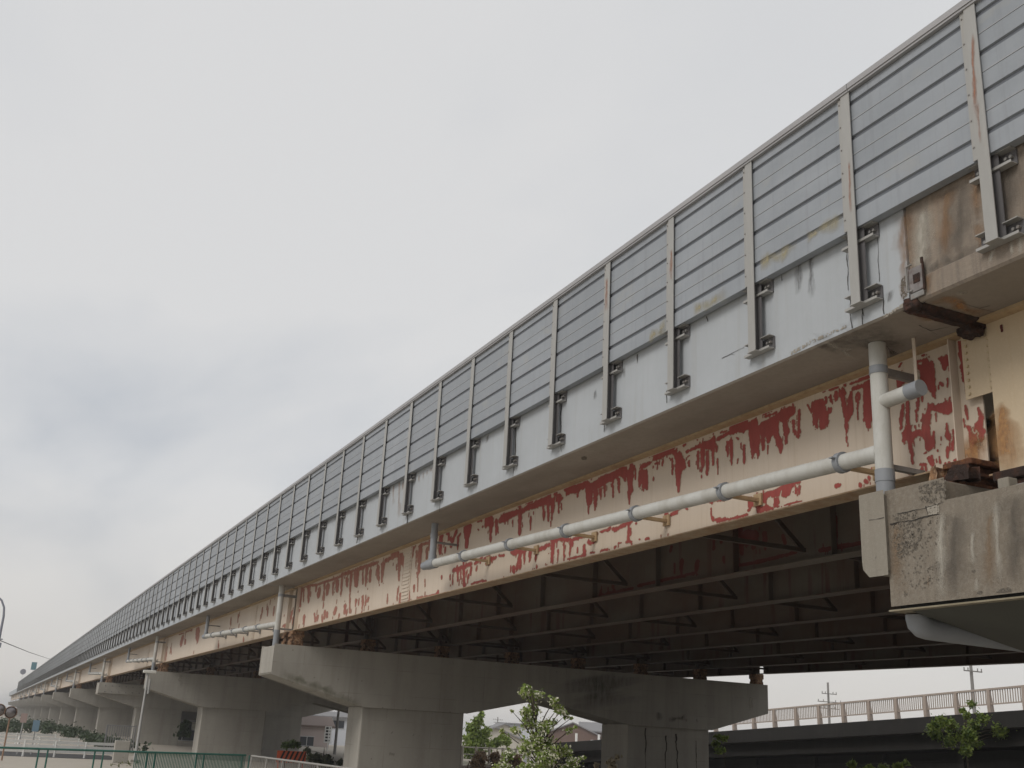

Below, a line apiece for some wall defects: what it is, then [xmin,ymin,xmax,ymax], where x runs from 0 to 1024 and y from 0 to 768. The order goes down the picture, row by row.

peeling [260,375,872,632]
peeling [893,340,986,596]
rust [997,407,1012,456]
crack [645,728,697,768]